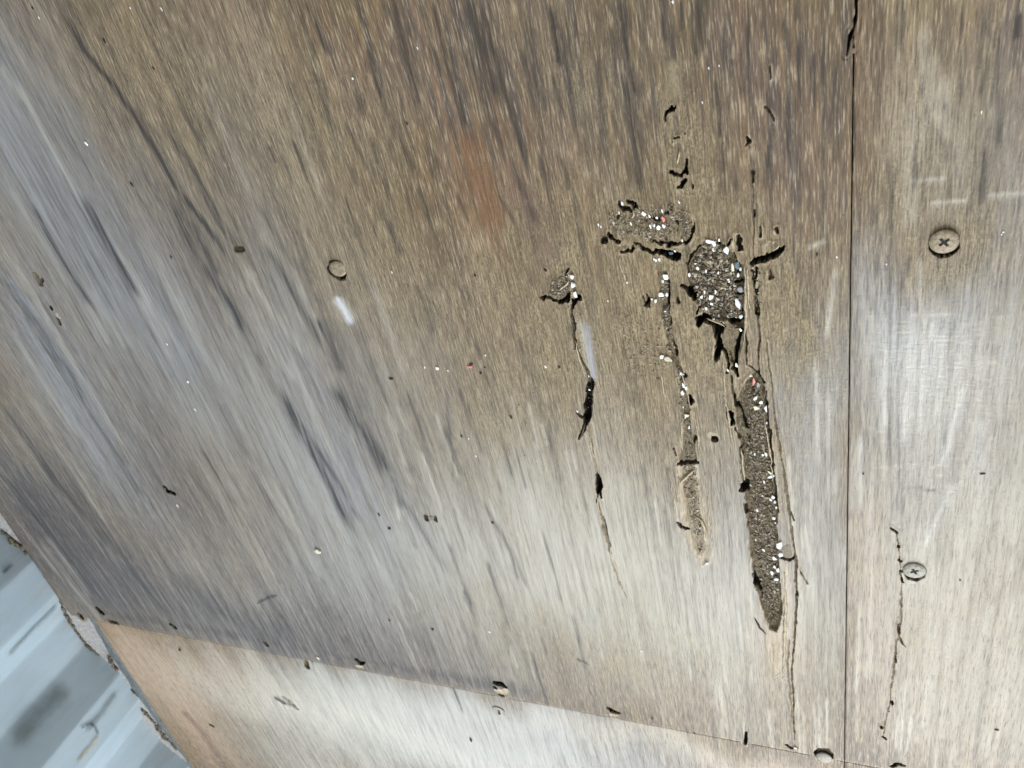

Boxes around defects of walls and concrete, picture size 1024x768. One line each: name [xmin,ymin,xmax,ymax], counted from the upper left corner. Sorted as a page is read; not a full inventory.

spalling [594,191,716,569]
spalling [721,360,791,680]
crack [875,523,913,743]